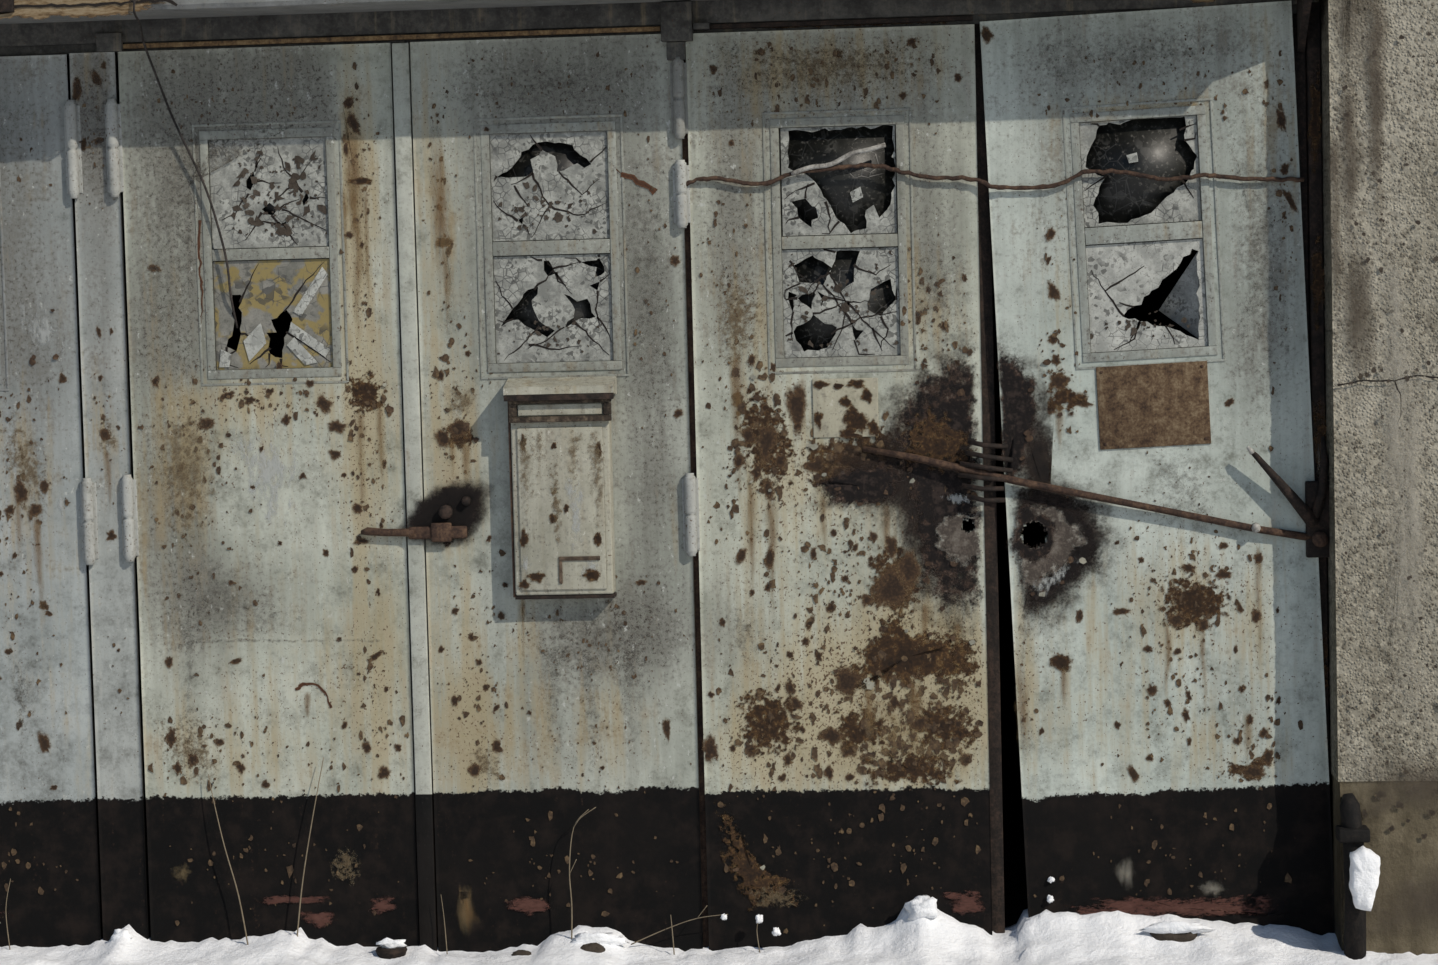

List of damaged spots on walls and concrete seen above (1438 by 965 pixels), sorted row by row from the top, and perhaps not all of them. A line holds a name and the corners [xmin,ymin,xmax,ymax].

peeling [0,0,178,20]